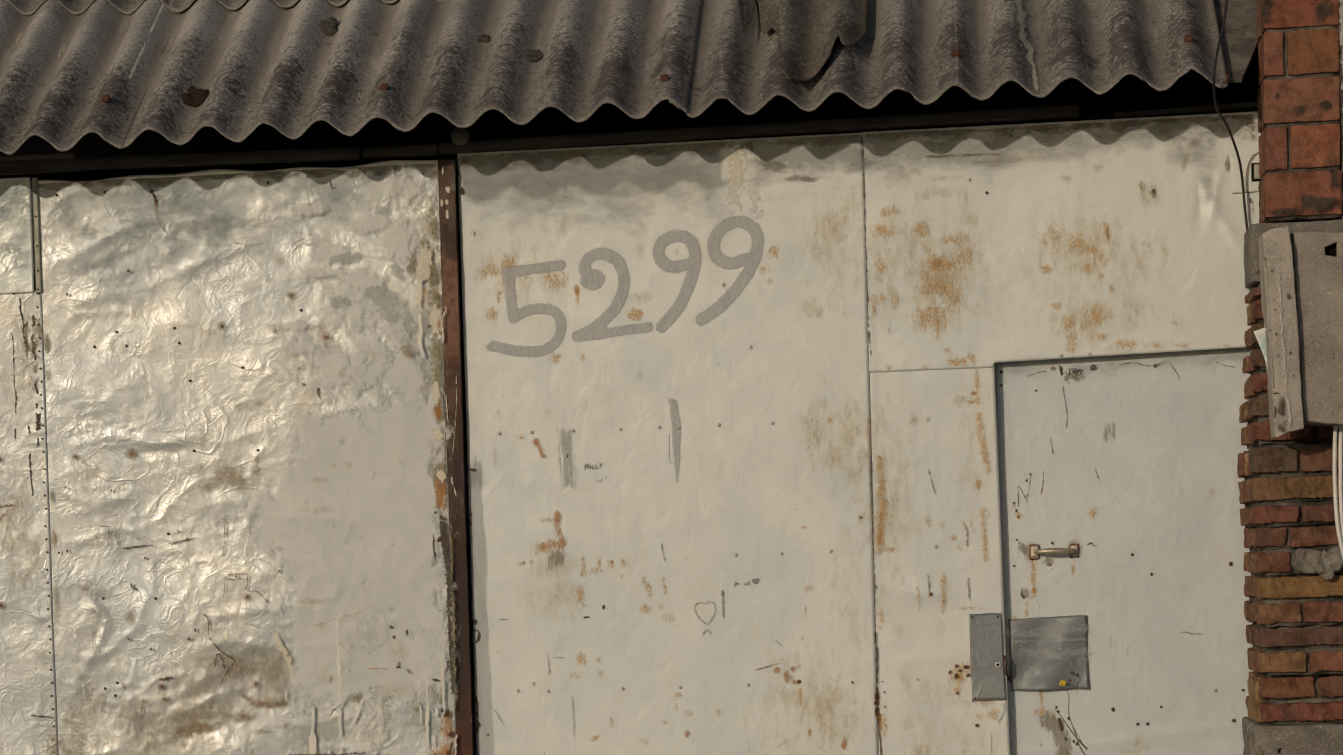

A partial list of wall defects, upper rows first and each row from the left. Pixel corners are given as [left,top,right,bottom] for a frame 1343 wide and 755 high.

corrosion [918,236,972,333]
corrosion [945,349,990,487]
corrosion [521,511,564,566]
corrosion [859,428,893,553]
corrosion [948,664,970,694]